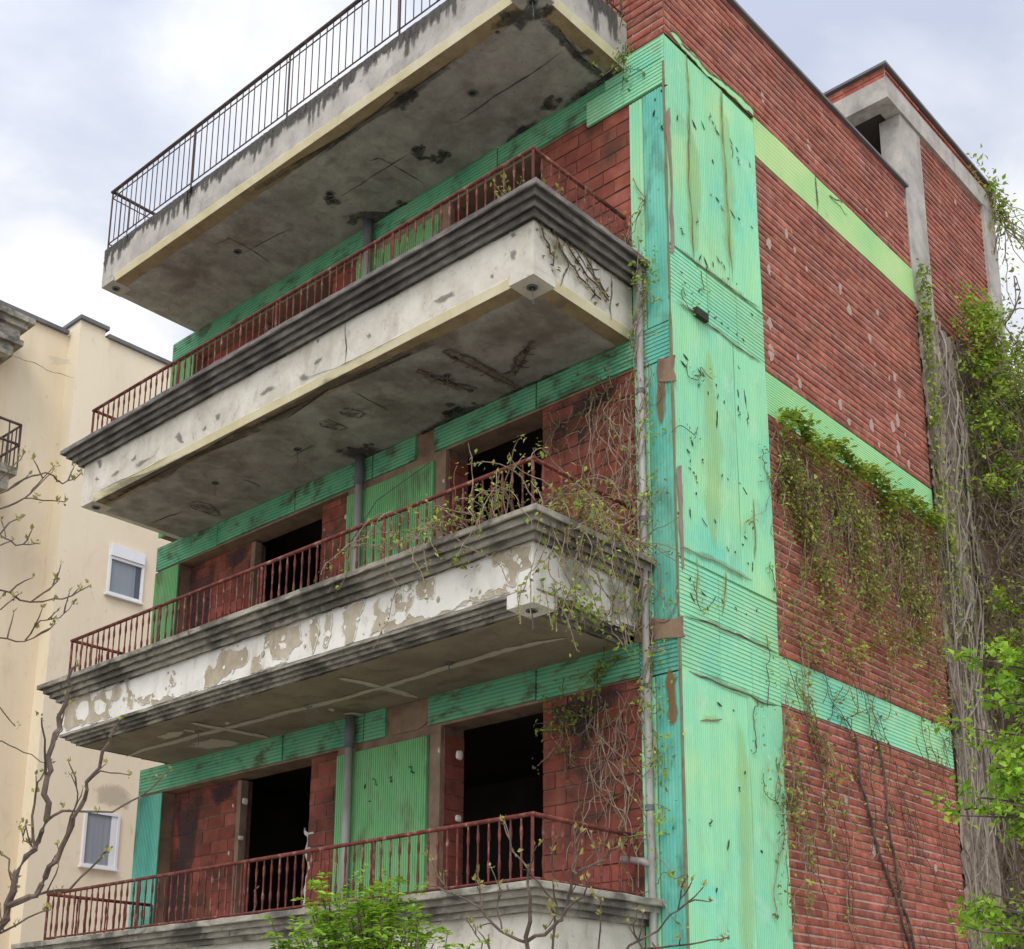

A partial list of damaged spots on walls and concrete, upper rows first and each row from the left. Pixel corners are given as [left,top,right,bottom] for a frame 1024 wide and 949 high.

damp [103,0,456,269]
crack [456,53,560,123]
peeling [656,354,725,427]
peeling [62,545,533,731]